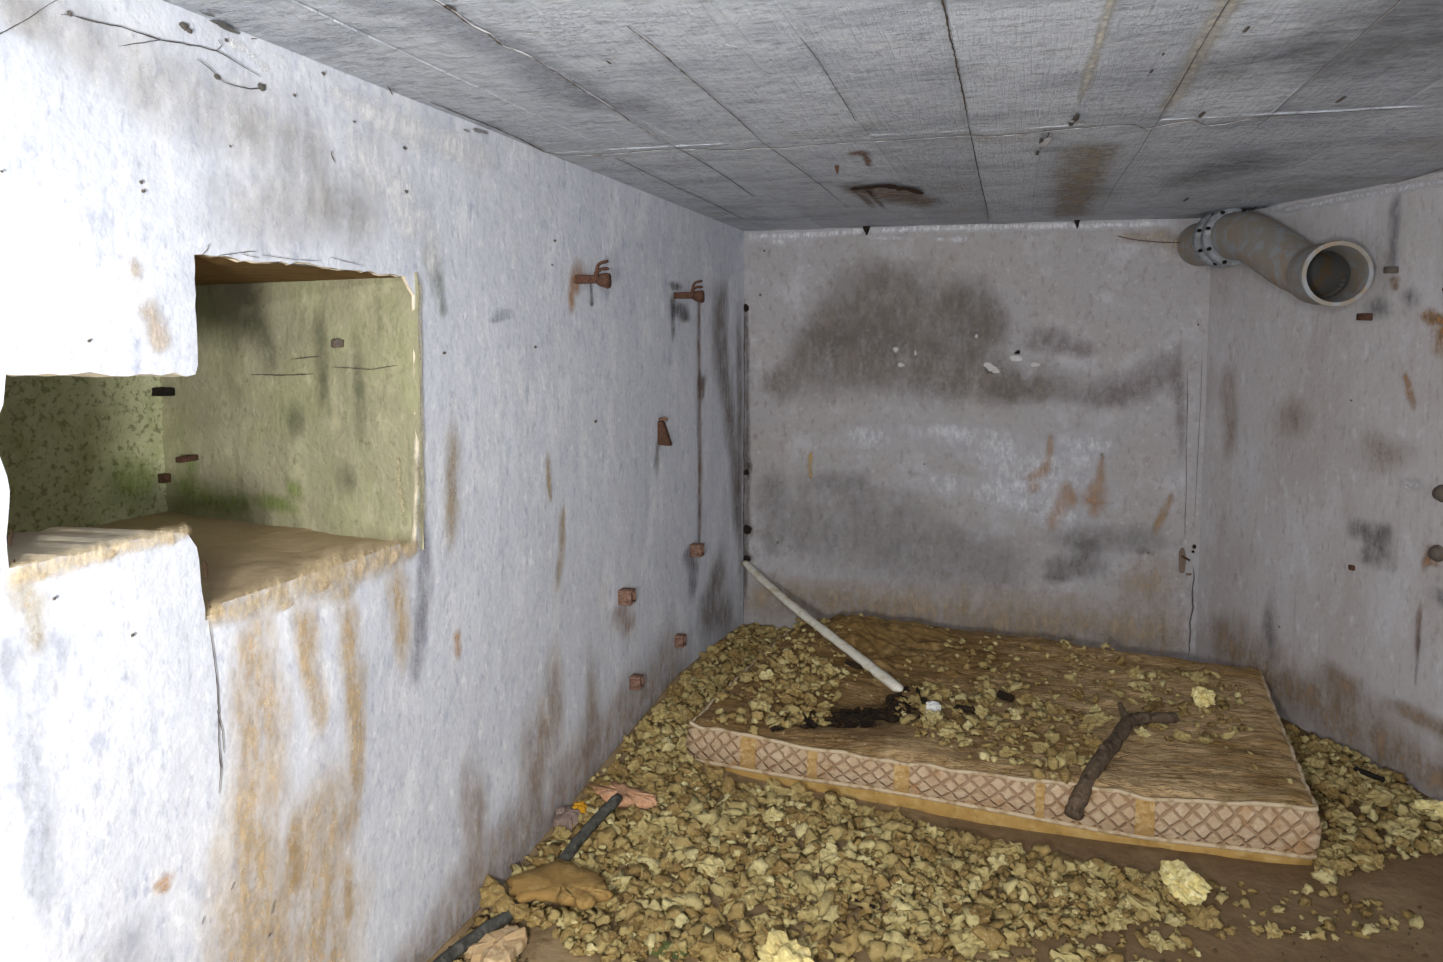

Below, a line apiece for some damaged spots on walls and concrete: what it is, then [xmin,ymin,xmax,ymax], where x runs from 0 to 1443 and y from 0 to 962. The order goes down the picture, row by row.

corrosion [569,268,593,310]
leakage [772,271,1054,399]
crack [208,614,225,790]
leakage [299,618,322,708]
leakage [345,617,362,785]
leakage [394,533,428,662]
leakage [230,781,279,962]
leakage [291,807,350,962]